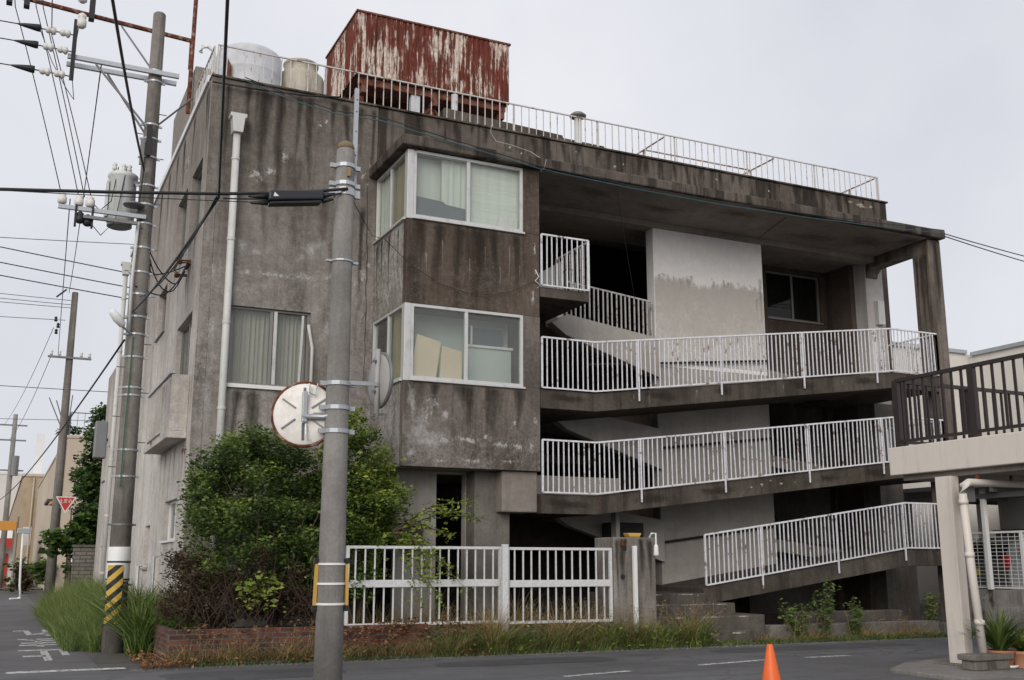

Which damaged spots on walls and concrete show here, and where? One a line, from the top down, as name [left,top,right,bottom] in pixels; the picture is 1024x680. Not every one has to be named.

water stain [247,89,285,142]
water stain [332,103,375,141]
water stain [655,273,766,371]
water stain [458,386,472,412]